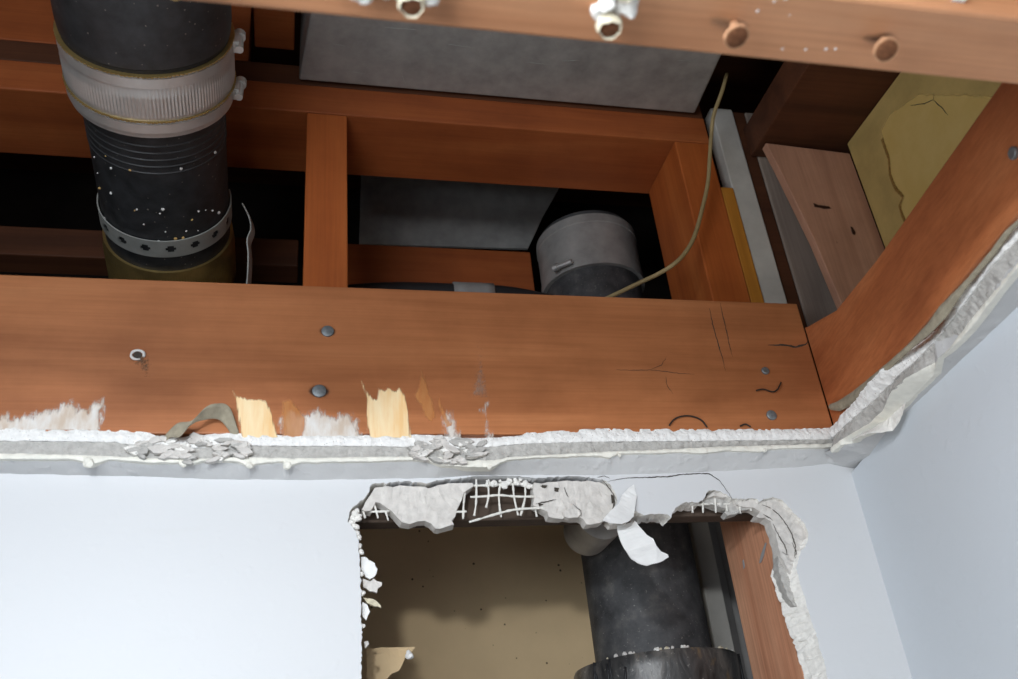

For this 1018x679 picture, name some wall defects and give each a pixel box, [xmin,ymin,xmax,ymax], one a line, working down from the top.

spalling [0,220,1018,471]
crack [709,303,733,371]
crack [774,341,808,349]
spalling [348,483,473,628]
spalling [530,481,668,566]
spalling [699,492,806,607]